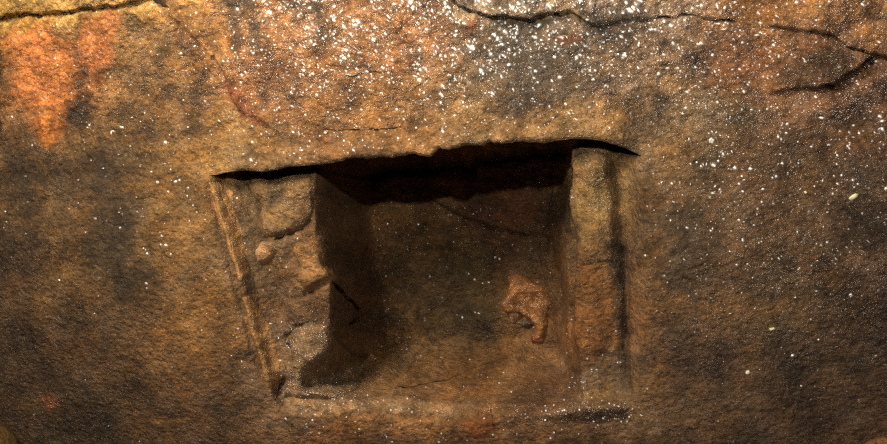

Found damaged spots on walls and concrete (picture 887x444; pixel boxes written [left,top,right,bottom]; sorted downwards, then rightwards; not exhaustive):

crack [0,0,169,20]
crack [453,0,746,27]
crack [779,31,887,94]